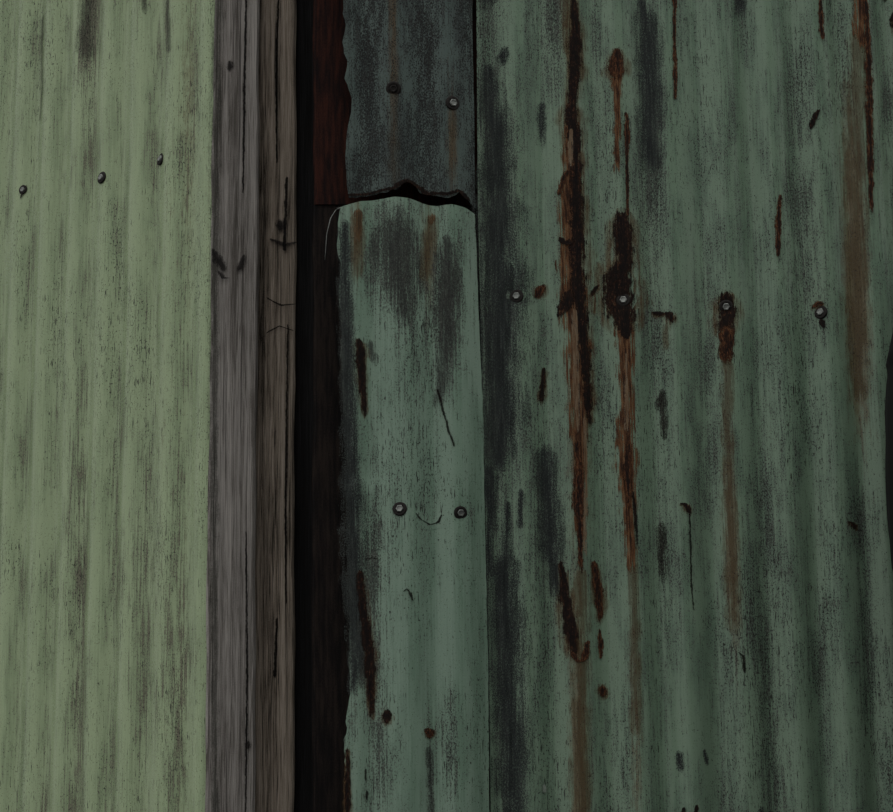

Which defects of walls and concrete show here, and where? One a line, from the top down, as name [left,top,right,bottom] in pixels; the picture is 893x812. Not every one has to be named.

corrosion [852,0,875,213]
corrosion [354,338,379,416]
corrosion [554,0,648,662]
corrosion [708,290,741,364]
corrosion [354,570,376,719]